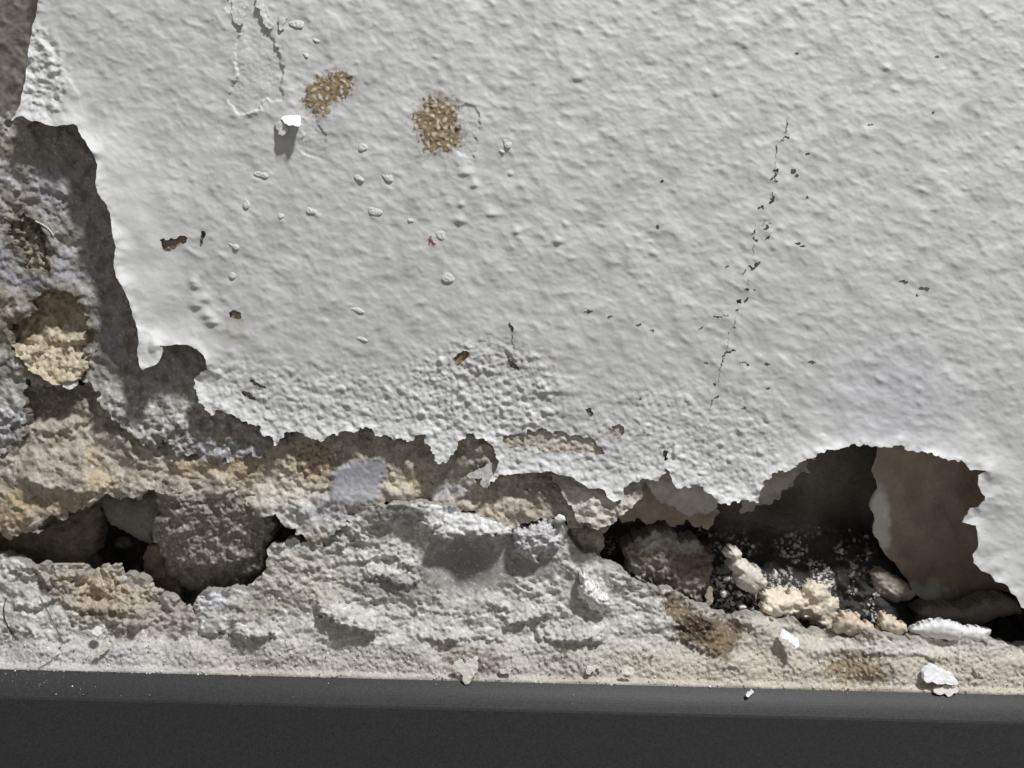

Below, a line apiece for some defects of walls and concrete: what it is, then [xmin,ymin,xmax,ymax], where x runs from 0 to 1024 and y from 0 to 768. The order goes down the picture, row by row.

spalling [0,0,274,463]
peeling [275,112,327,159]
peeling [456,103,481,159]
crack [704,121,789,405]
spalling [0,370,1024,695]